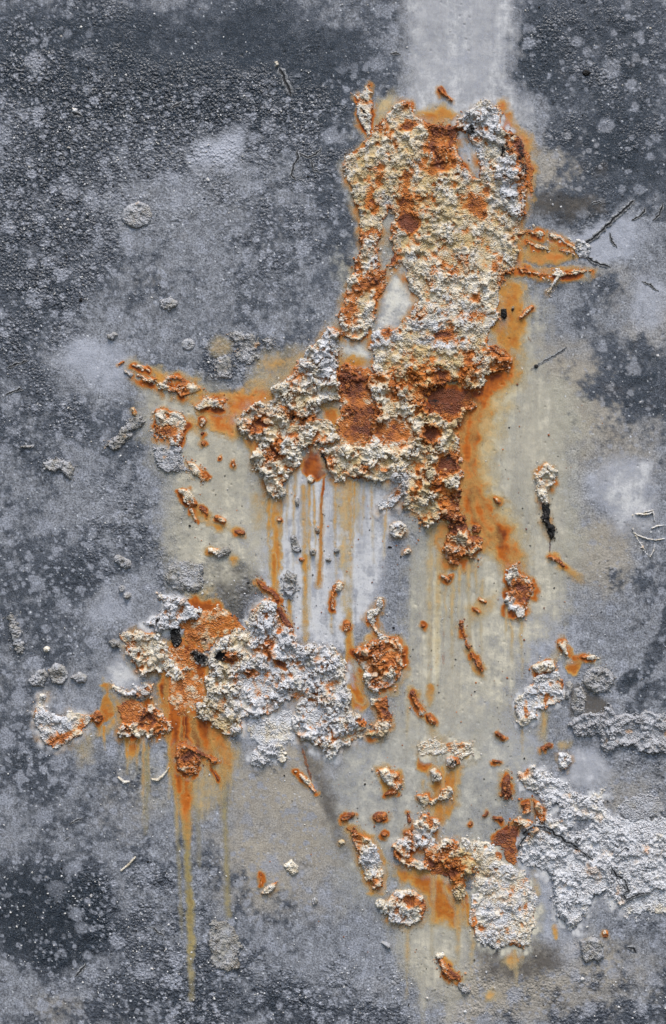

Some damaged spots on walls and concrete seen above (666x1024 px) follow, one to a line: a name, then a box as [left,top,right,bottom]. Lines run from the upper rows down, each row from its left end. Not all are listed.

rust [413,86,459,125]
rust [497,99,538,201]
rust [150,353,303,453]
rust [425,227,595,571]
leakage [128,0,666,996]
rust [188,594,224,612]
rust [427,522,523,677]
rust [97,682,137,742]
rust [124,734,150,799]
rust [157,636,239,999]
rust [338,812,475,986]
crack [517,822,666,912]